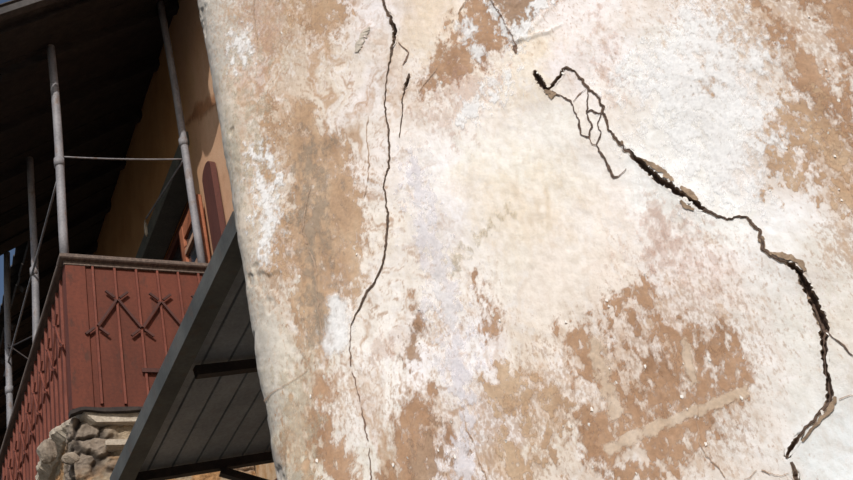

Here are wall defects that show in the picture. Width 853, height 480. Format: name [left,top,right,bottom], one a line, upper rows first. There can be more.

peeling [419,0,536,101]
crack [490,0,518,54]
peeling [690,70,723,98]
peeling [738,0,853,219]
peeling [259,93,369,480]
crack [349,0,437,480]
peeling [478,274,755,480]
crack [531,66,853,480]